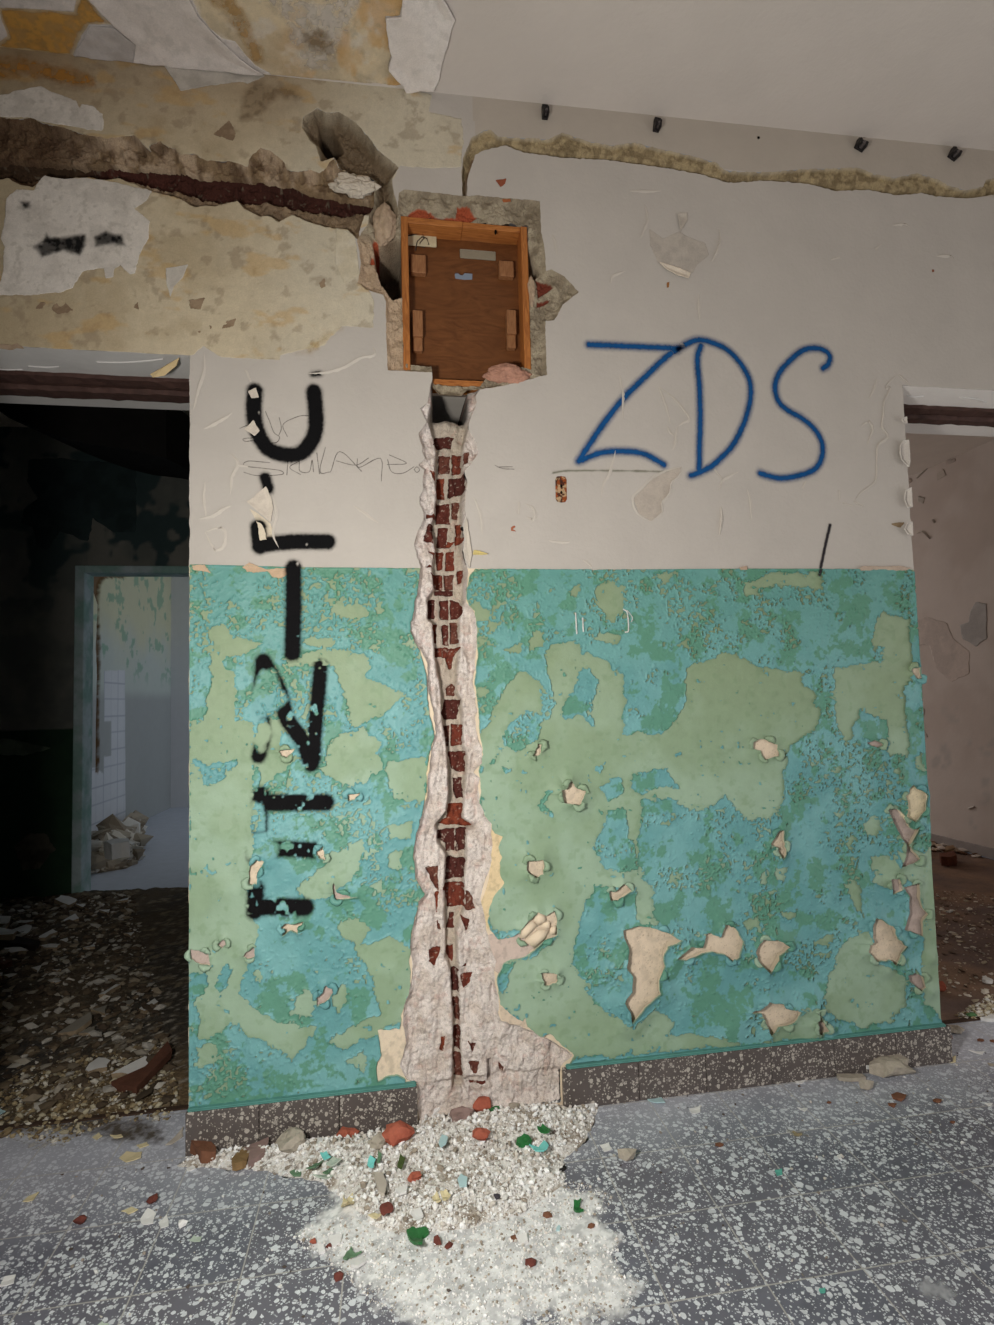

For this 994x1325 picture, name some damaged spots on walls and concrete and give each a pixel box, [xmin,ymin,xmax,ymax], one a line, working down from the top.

flaking render [0,0,578,396]
peeling [184,563,434,1107]
crack [400,380,572,1120]
peeling [467,566,953,1064]
peeling [960,602,988,646]